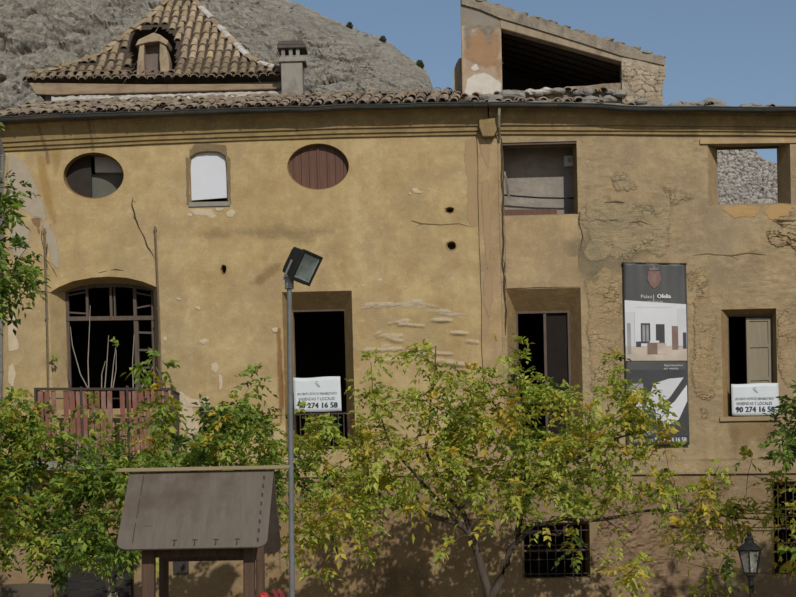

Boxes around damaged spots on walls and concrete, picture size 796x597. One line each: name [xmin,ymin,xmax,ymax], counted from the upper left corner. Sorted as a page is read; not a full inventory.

flaking render [7,155,59,269]
crack [131,198,154,257]
spalling [186,143,235,218]